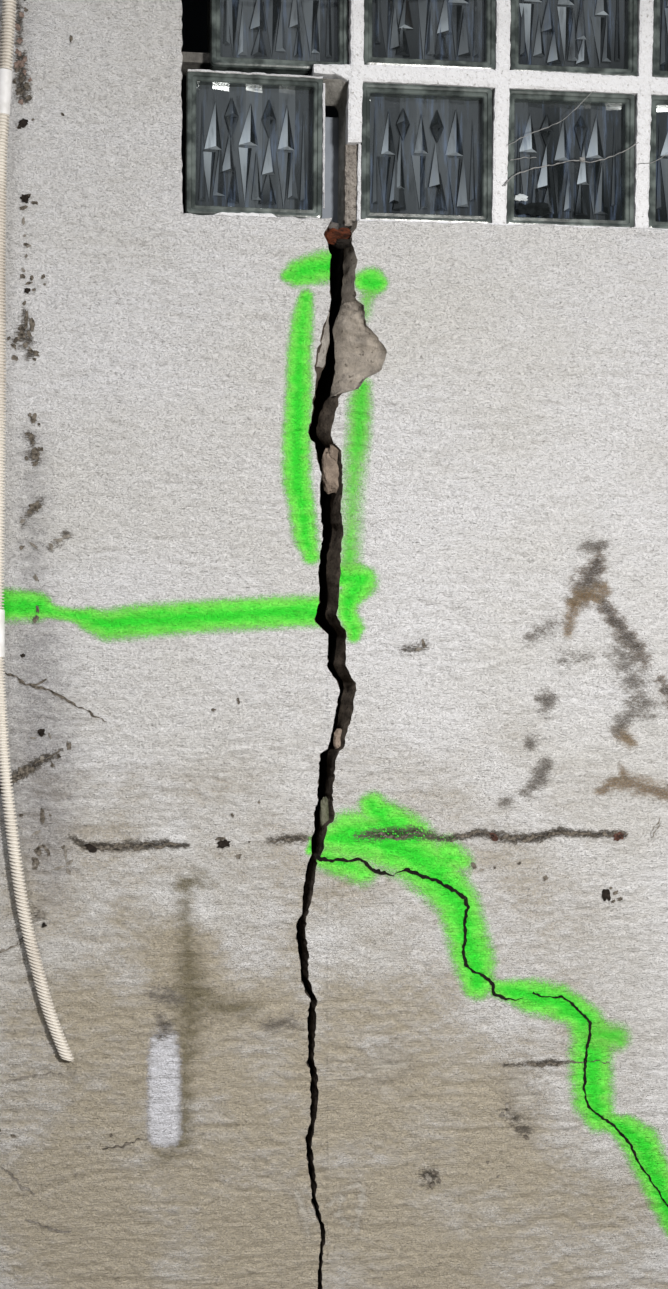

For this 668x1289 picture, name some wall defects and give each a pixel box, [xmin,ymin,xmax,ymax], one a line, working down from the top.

corrosion [324,222,351,249]
spalling [329,300,387,398]
crack [68,220,668,1289]